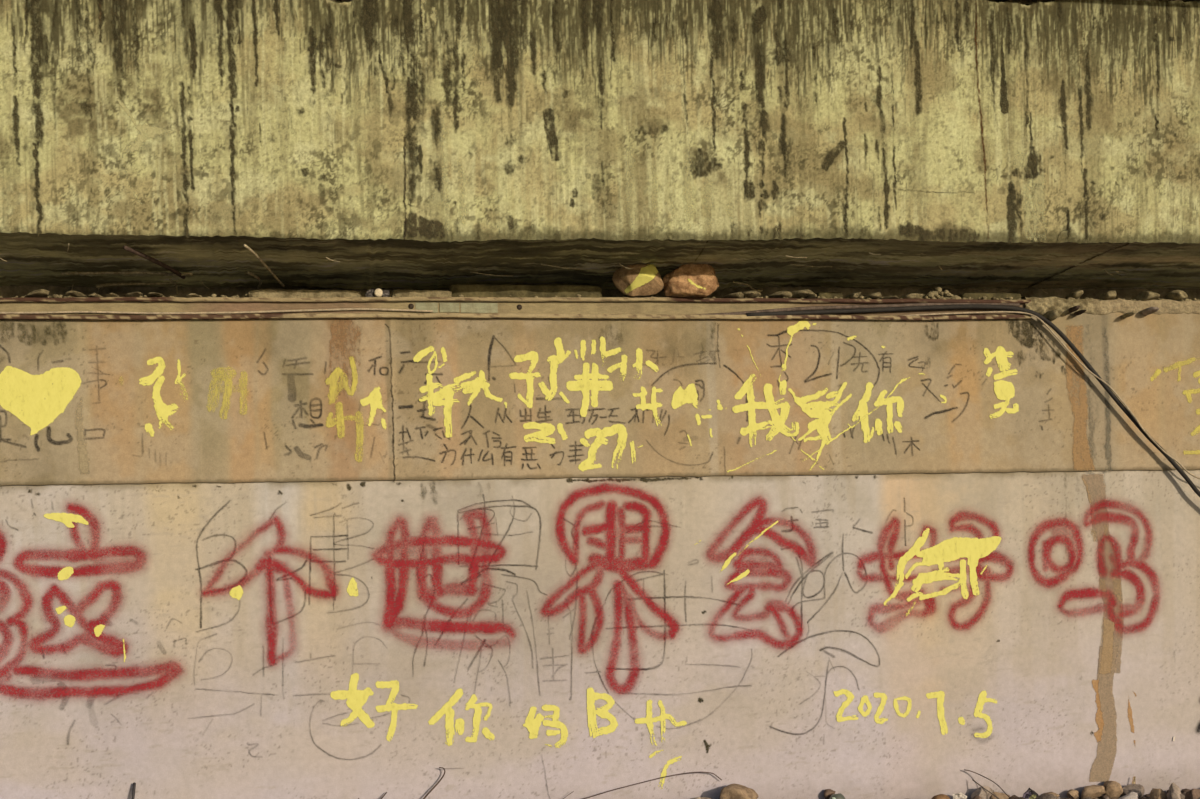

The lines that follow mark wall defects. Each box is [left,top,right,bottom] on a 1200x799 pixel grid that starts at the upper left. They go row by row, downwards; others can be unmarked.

damp [12,0,56,236]
damp [177,0,198,238]
damp [215,0,258,235]
damp [308,25,341,94]
damp [353,0,555,238]
damp [543,108,559,161]
damp [684,0,737,226]
damp [739,0,791,237]
damp [821,66,980,242]
damp [910,0,927,115]
damp [990,7,1042,114]
damp [1007,53,1105,244]